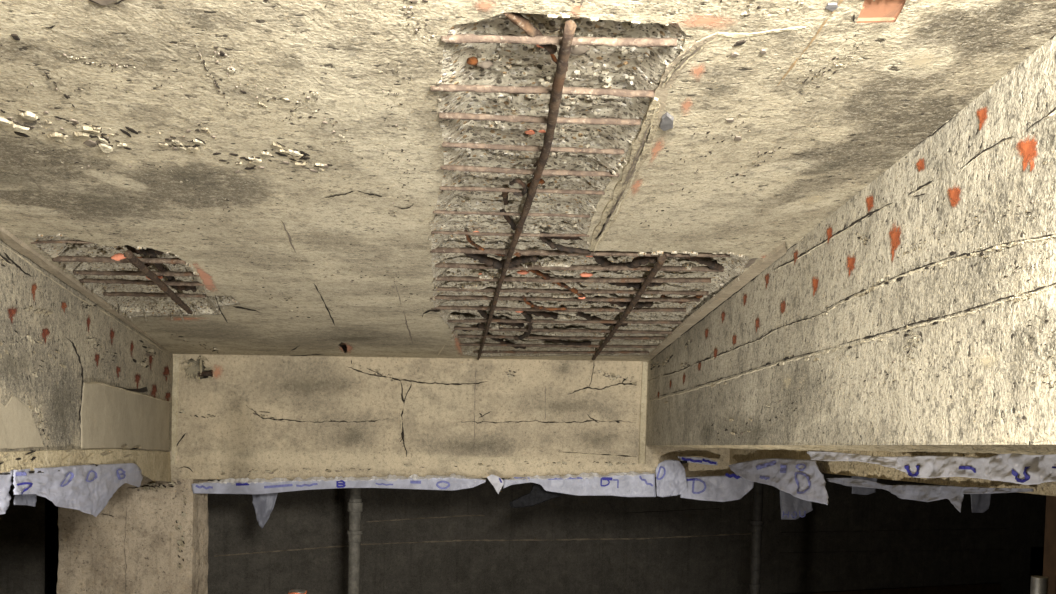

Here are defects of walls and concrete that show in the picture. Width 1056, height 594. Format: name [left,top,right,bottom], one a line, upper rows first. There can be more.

spalling [30,234,240,322]
spalling [403,0,751,385]
crack [745,180,935,270]
corrosion [889,227,901,262]
corrosion [948,187,961,207]
corrosion [977,107,988,131]
crack [959,107,1056,171]
corrosion [1017,136,1037,171]
peeling [0,387,49,475]
peeling [80,382,215,466]
crack [246,360,488,457]
crack [457,305,839,424]